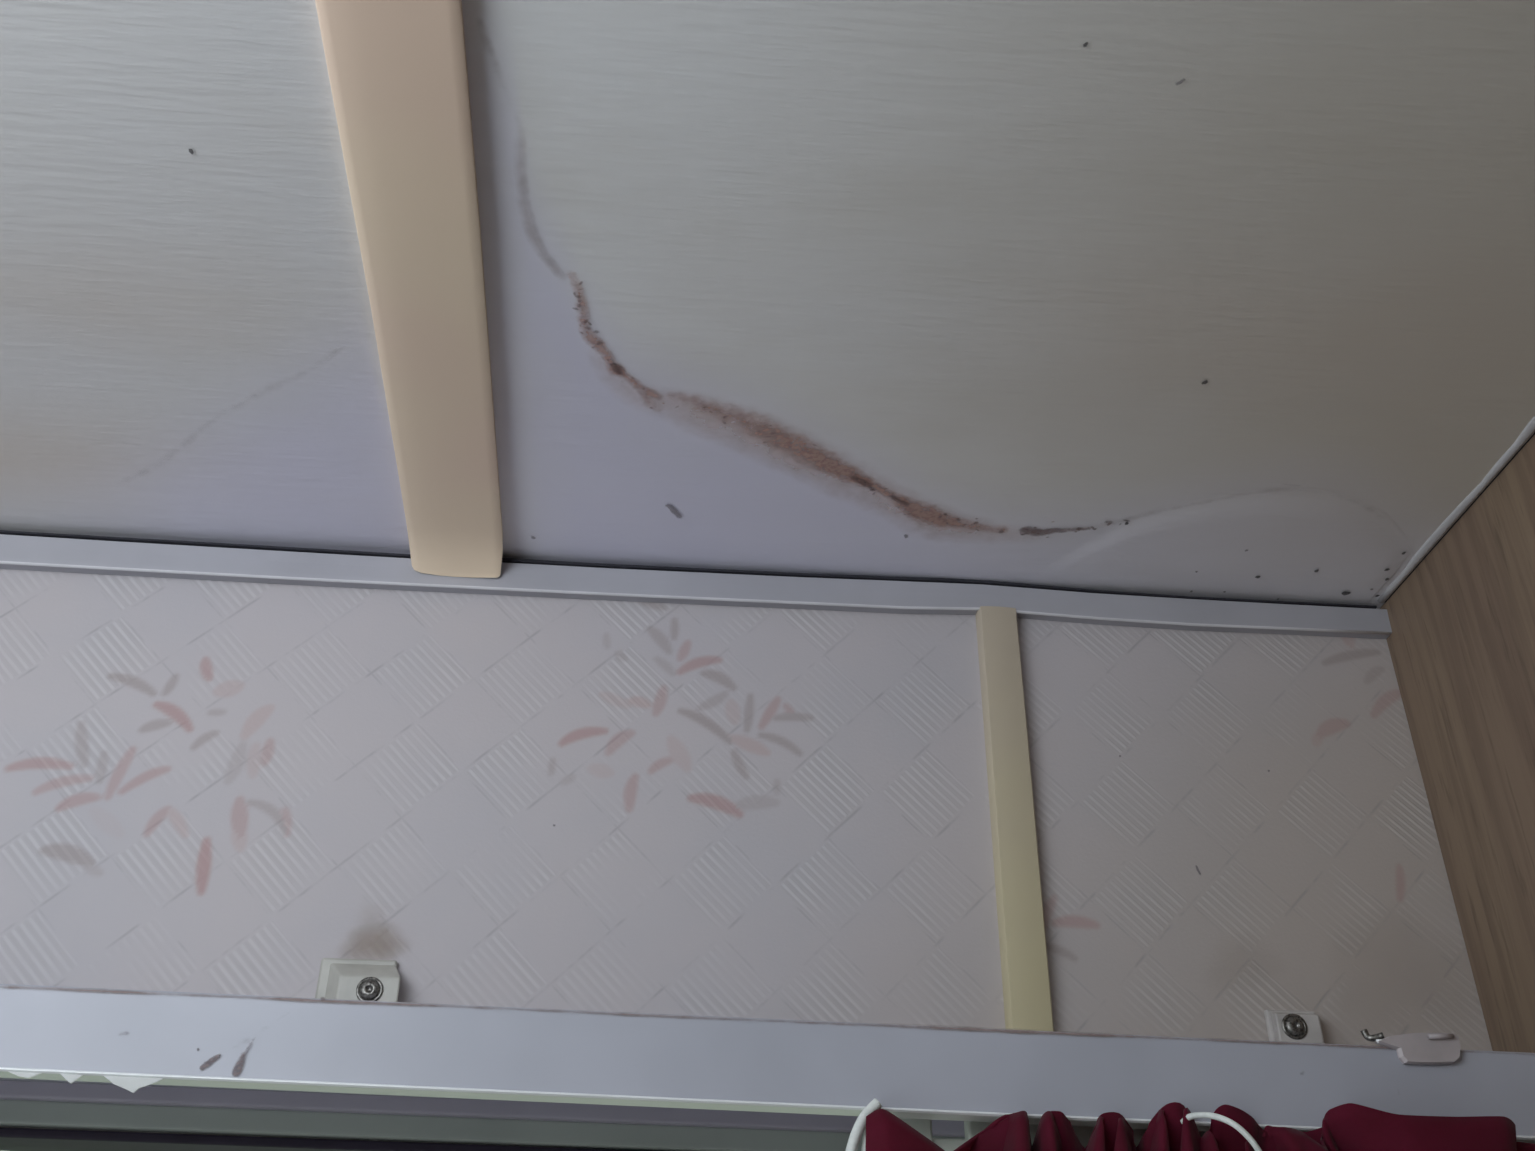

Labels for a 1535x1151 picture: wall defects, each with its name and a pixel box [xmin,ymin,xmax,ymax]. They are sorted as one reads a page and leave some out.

leakage [573,282,657,397]
leakage [743,421,979,531]
leakage [1000,520,1129,535]